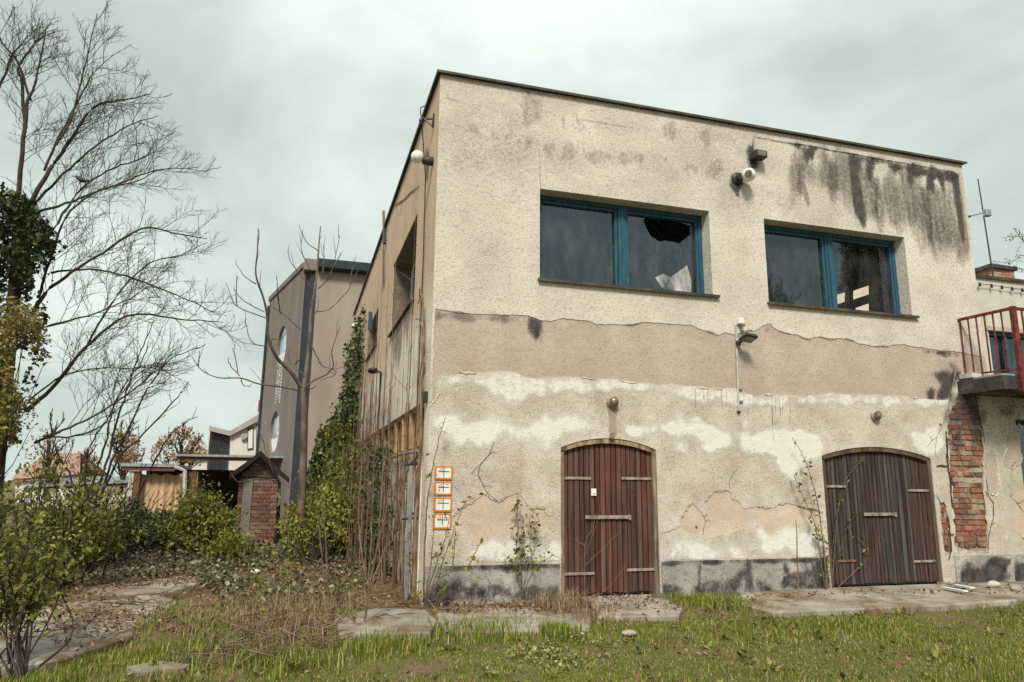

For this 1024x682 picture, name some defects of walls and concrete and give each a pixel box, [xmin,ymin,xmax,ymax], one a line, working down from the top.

leakage [792,143,967,255]
leakage [446,373,651,406]
leakage [665,351,960,409]
leakage [432,413,600,450]
peeling [429,309,989,556]
leakage [625,411,825,480]
leakage [910,426,946,456]
peeling [1002,424,1023,469]
crack [472,442,539,547]
peeling [1010,489,1024,539]
leakage [661,522,830,595]
leakage [961,557,1024,583]